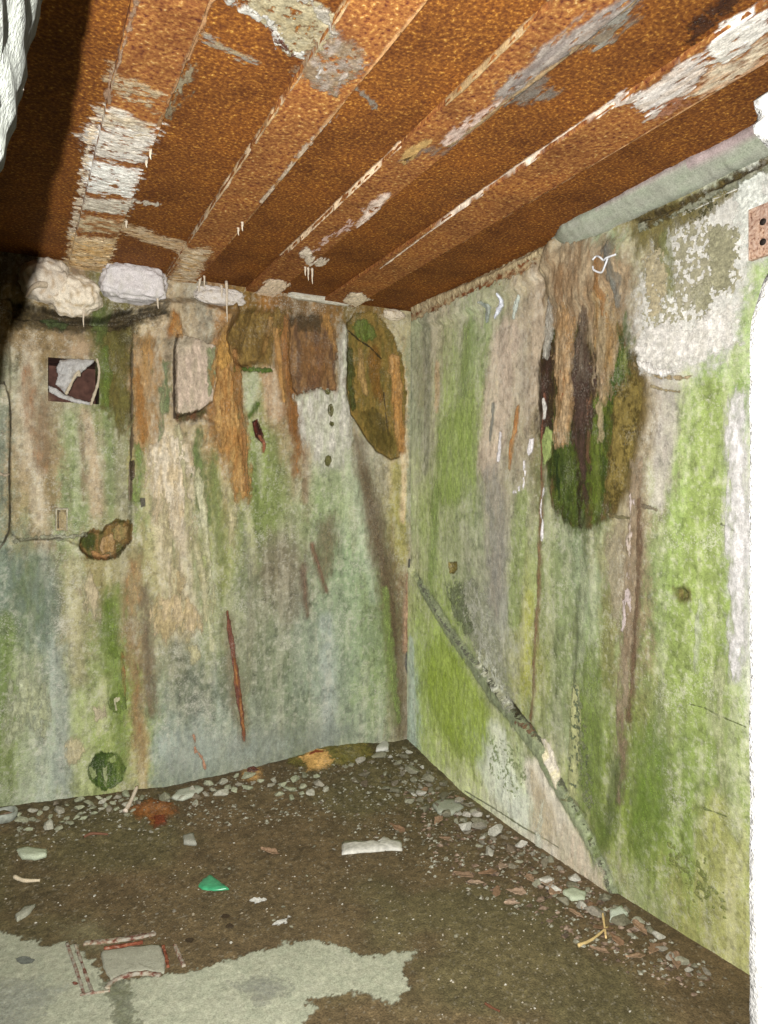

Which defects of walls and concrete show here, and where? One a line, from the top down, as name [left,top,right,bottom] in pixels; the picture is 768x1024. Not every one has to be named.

corrosion [687,0,738,46]
corrosion [411,248,540,322]
leakage [634,156,768,292]
spalling [226,307,407,470]
leakage [543,244,620,522]
leakage [446,464,513,713]
corrosion [226,610,247,742]
crack [403,559,618,894]